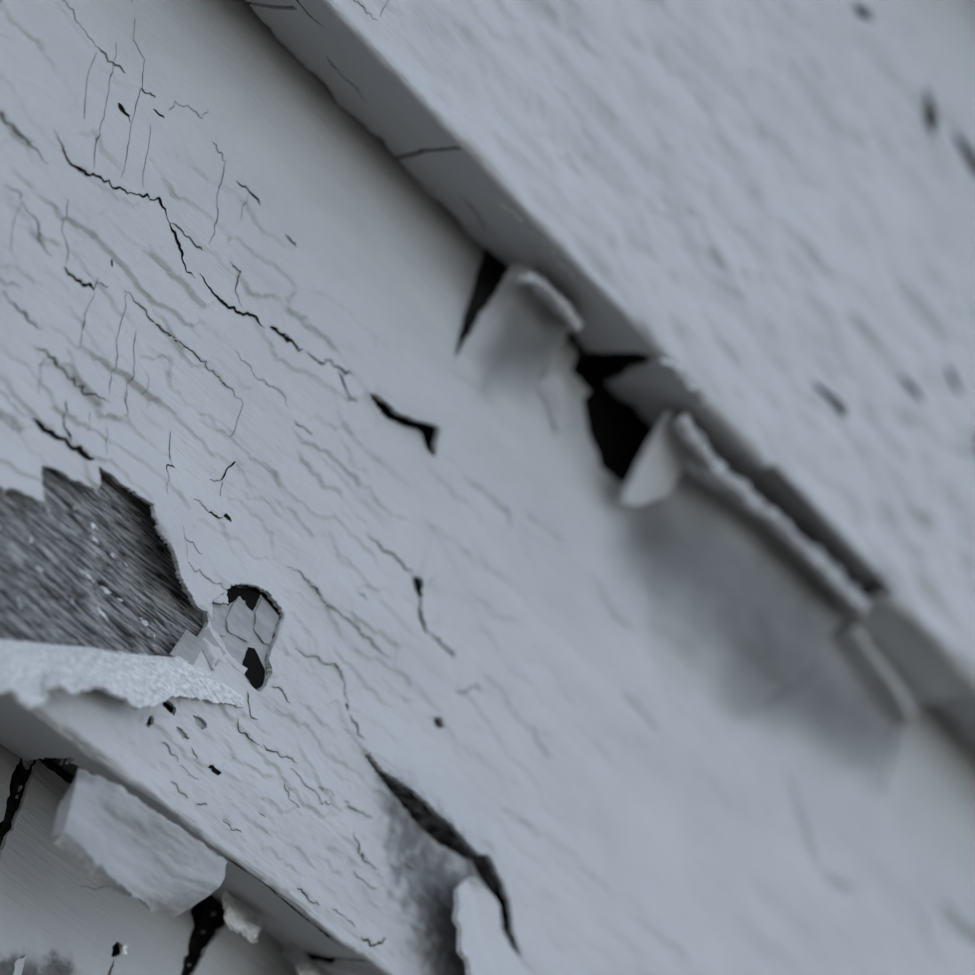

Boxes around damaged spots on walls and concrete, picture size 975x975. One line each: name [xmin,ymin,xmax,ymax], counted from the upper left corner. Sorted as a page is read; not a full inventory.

crack [0,0,432,461]
peeling [511,269,583,332]
peeling [537,372,575,432]
crack [193,461,236,521]
peeling [0,467,279,710]
crack [289,567,391,660]
crack [368,535,455,659]
crack [295,648,364,741]
crack [0,757,73,828]
crack [163,742,242,833]
crack [189,897,208,940]
peeling [399,819,529,975]